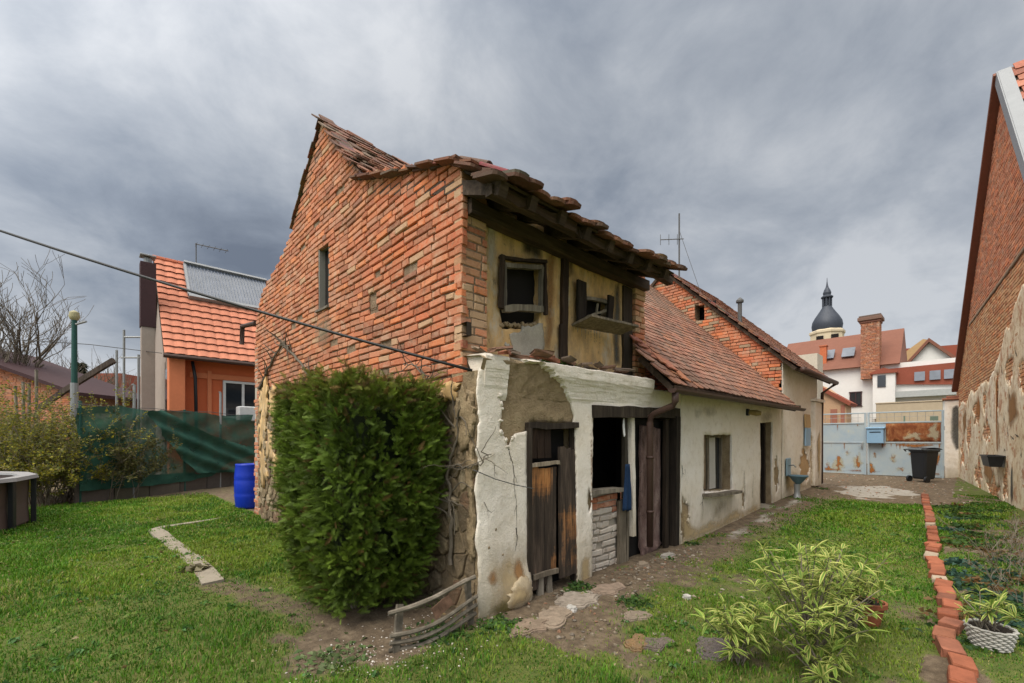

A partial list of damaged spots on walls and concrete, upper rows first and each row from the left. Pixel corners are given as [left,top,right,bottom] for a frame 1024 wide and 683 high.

peeling [257,376,278,488]
crack [484,448,518,550]
spalling [497,391,573,449]
peeling [799,450,812,480]
rust [825,423,941,474]
peeling [958,284,1024,511]